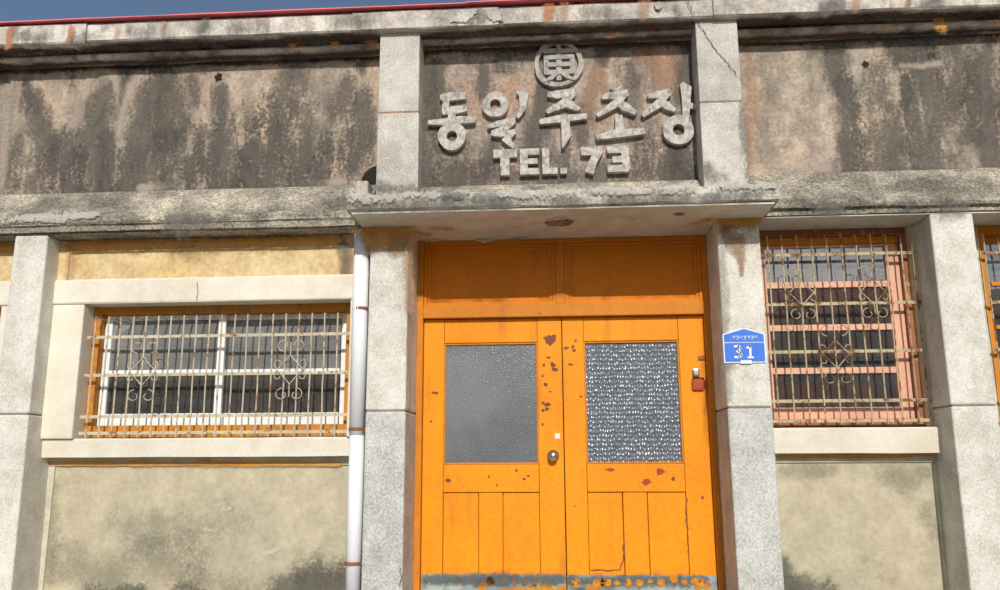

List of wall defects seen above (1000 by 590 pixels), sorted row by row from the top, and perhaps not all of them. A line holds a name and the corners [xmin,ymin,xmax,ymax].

leakage [0,51,380,195]
leakage [423,36,714,200]
crack [687,0,743,83]
leakage [738,29,1000,173]
peeling [541,334,577,426]